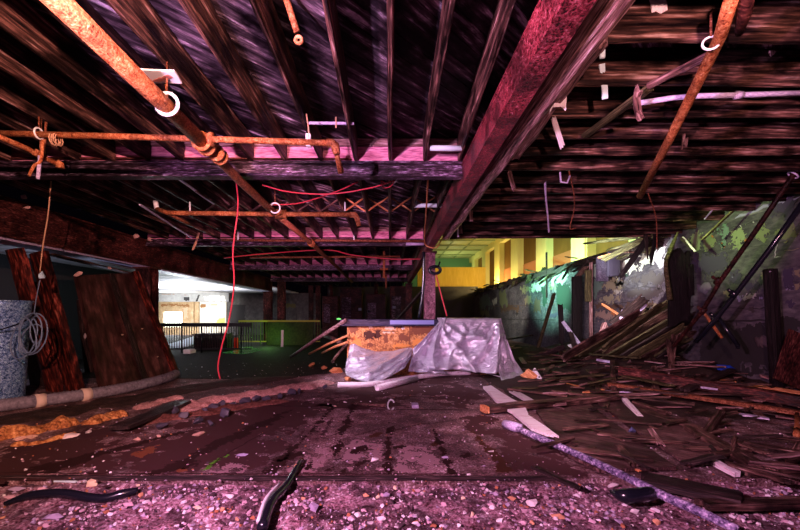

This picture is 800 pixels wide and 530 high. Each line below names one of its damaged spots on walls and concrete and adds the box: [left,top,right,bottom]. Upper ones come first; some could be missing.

spalling [593,243,667,304]
corrosion [349,326,434,349]